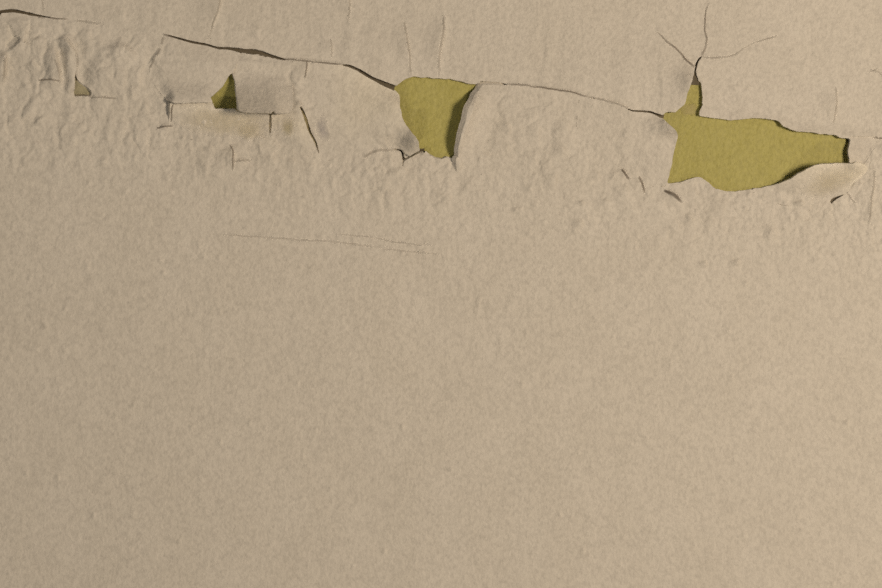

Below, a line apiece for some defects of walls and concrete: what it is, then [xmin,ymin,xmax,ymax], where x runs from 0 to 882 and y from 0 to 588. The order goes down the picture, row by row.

crack [0,9,60,19]
peeling [0,16,90,101]
crack [168,35,288,60]
crack [320,62,395,90]
crack [683,56,701,85]
crack [300,107,318,149]
peeling [150,35,505,180]
crack [628,109,664,118]
peeling [577,32,882,210]